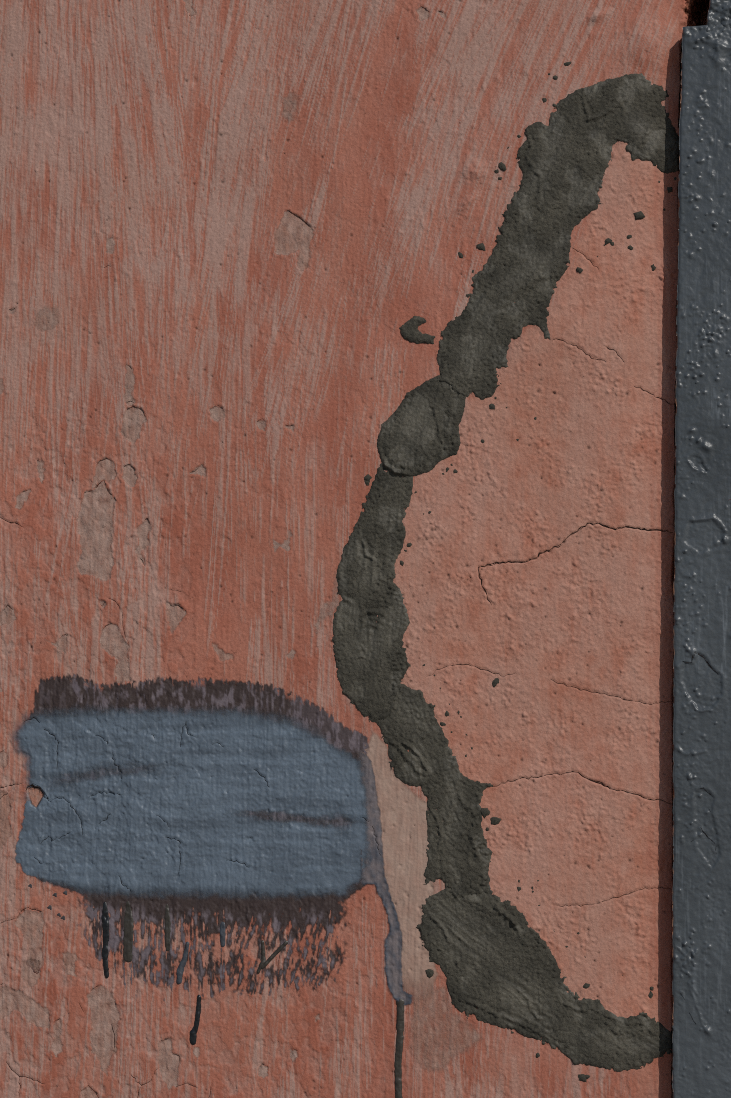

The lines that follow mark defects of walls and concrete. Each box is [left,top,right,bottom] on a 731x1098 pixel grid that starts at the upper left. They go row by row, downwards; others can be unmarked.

crack [676,41,684,129]
crack [637,367,676,476]
peeling [77,457,138,581]
crack [478,523,672,599]
crack [499,760,673,821]